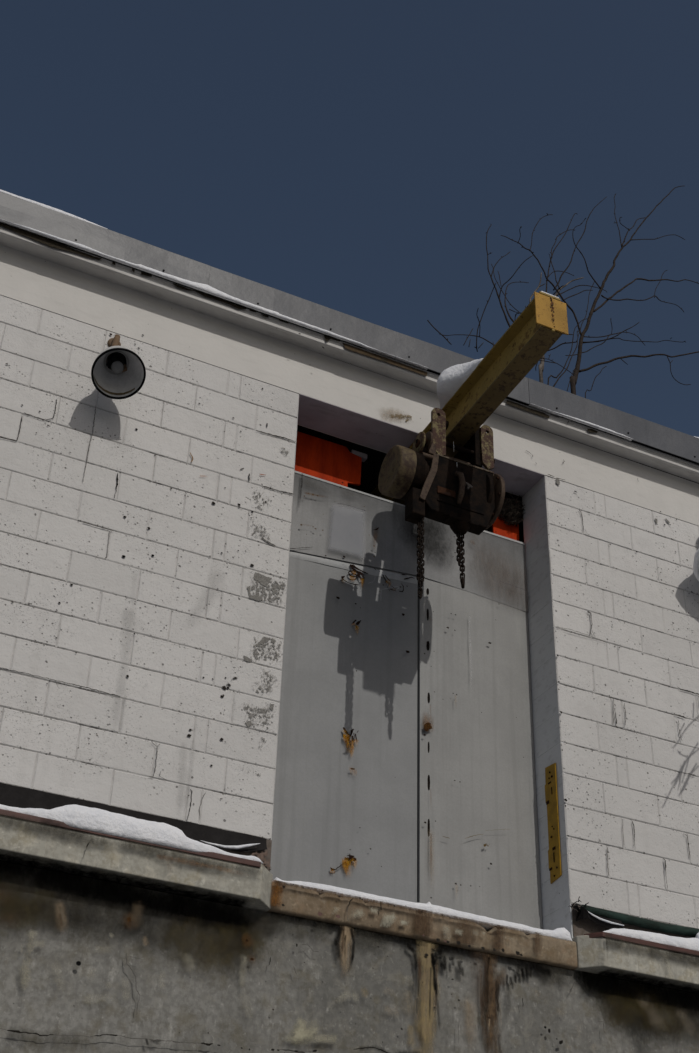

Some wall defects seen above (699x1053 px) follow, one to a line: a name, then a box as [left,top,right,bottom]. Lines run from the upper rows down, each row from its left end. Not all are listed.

peeling [247,564,286,604]
peeling [243,635,282,748]
corrosion [343,727,358,750]
corrosion [330,849,356,872]
crack [0,1028,317,1053]
crack [354,1045,417,1053]